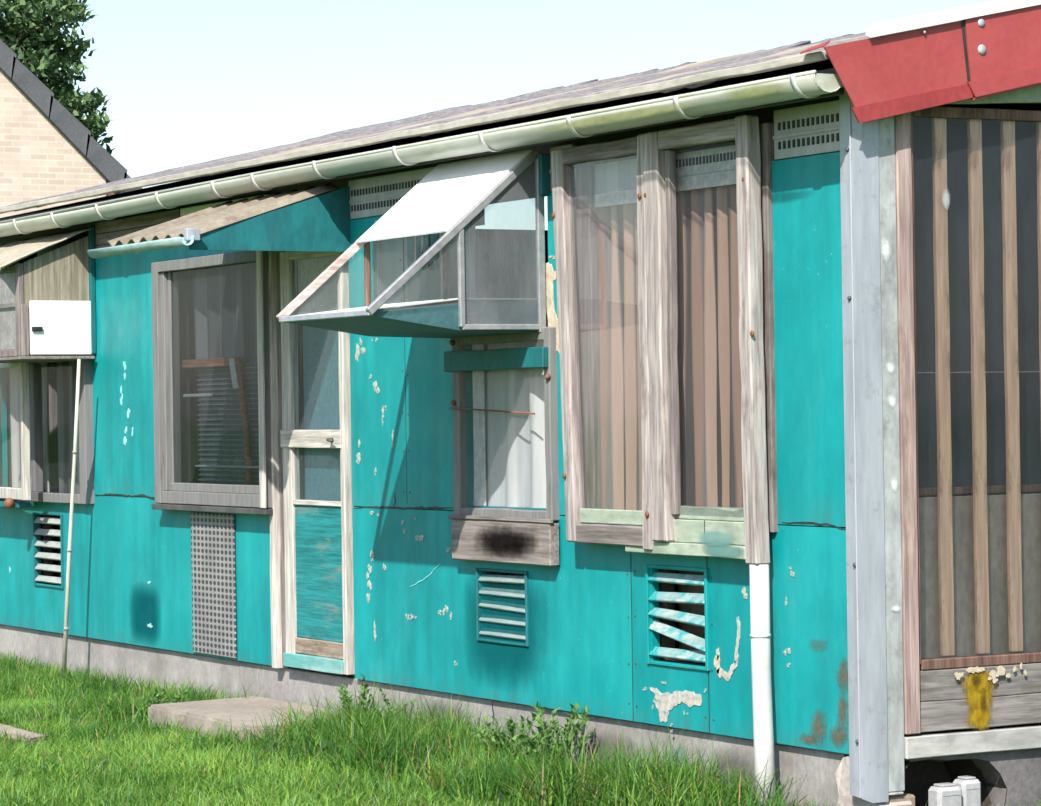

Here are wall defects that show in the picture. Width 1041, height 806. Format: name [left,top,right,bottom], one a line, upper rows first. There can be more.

peeling [545,256,560,354]
peeling [355,338,378,361]
peeling [120,361,133,445]
crack [97,492,155,500]
crack [782,521,846,529]
peeling [366,550,386,603]
damp [134,593,157,636]
peeling [714,617,741,681]
corrosion [839,663,848,685]
peeling [954,662,1027,683]
peeling [643,681,707,733]
corrosion [803,699,846,744]